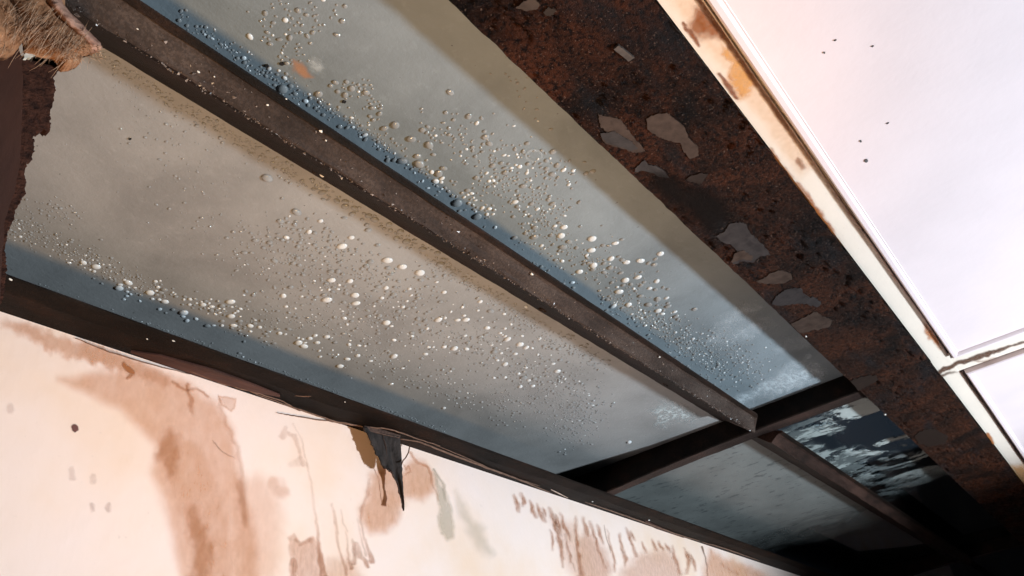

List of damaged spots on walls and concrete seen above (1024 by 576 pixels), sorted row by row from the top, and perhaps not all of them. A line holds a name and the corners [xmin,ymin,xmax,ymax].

rust [682,0,836,196]
peeling [598,113,669,178]
peeling [646,112,699,159]
rust [774,155,834,234]
peeling [715,221,770,264]
peeling [754,270,832,333]
water stain [85,348,135,378]